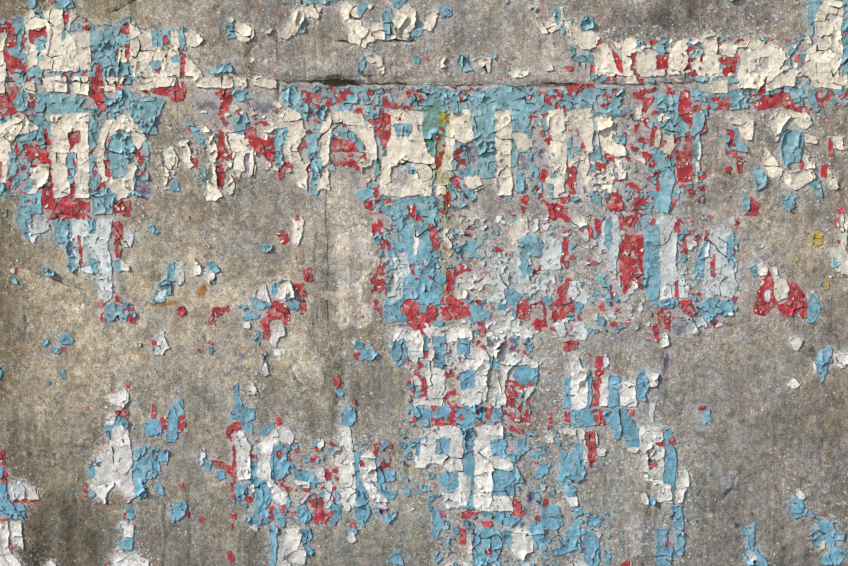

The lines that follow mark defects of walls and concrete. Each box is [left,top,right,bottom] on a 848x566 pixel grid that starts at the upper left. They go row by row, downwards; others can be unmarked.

peeling [225,0,462,76]
peeling [438,52,498,79]
peeling [828,207,848,275]
peeling [150,259,184,304]
spalling [204,257,344,397]
peeling [750,256,832,327]
peeling [789,336,848,382]
peeling [137,399,188,443]
peeling [0,451,39,566]
peeling [196,384,397,566]
peeling [742,522,783,566]
peeling [792,488,846,565]